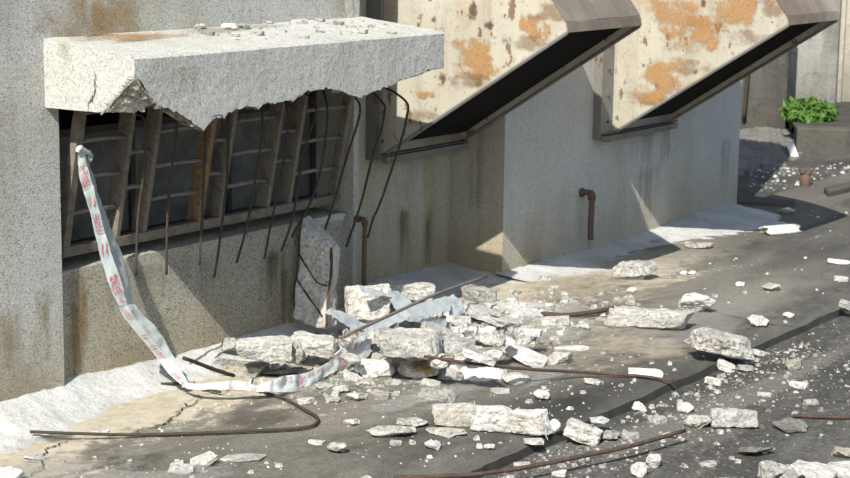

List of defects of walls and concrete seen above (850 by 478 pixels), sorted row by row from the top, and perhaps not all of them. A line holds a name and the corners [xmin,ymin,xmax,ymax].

corrosion [519,15,550,41]
corrosion [651,0,756,50]
crack [87,72,149,112]
corrosion [452,38,499,80]
corrosion [636,58,681,104]
spalling [101,78,267,278]
spalling [263,68,443,259]